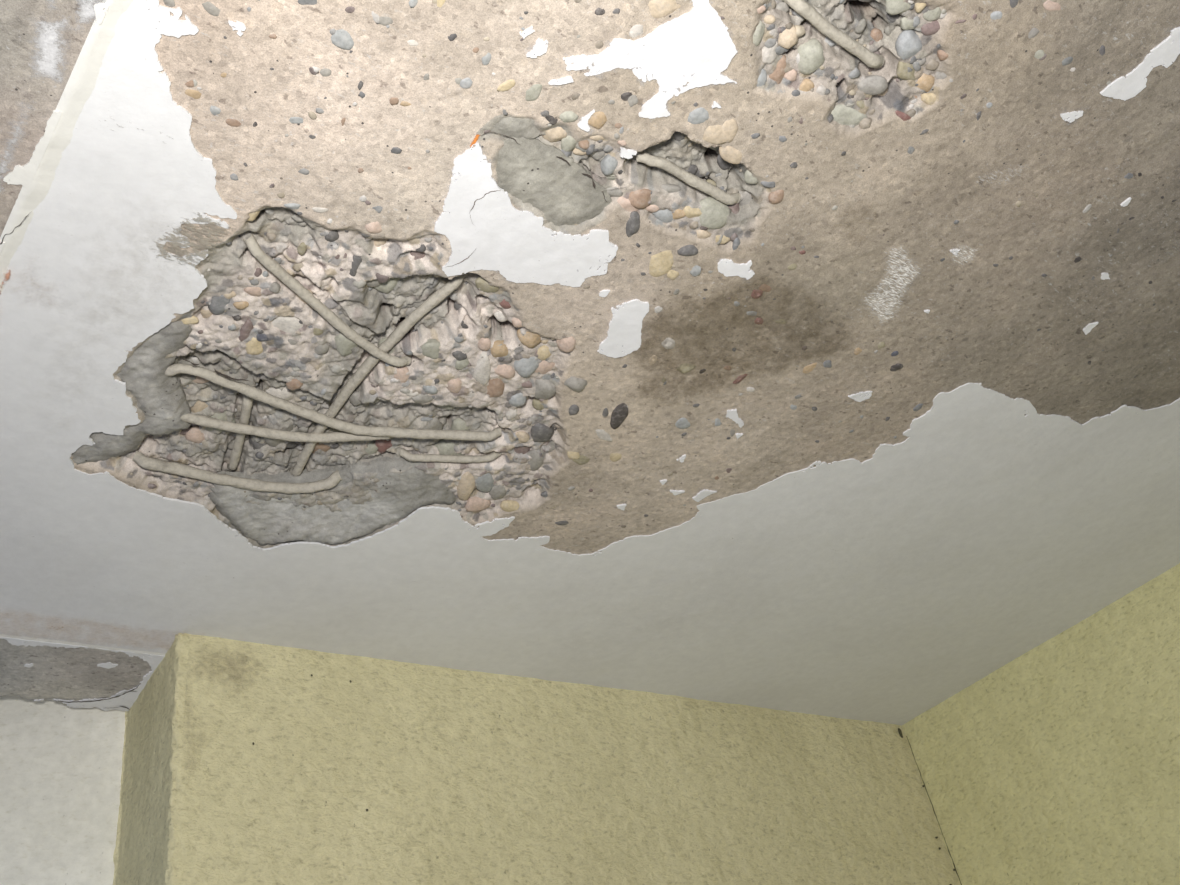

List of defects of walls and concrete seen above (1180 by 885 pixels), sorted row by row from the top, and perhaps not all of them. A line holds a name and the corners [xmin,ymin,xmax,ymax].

peeling [33,0,109,82]
peeling [0,110,62,190]
peeling [70,0,1180,555]
peeling [0,637,165,711]